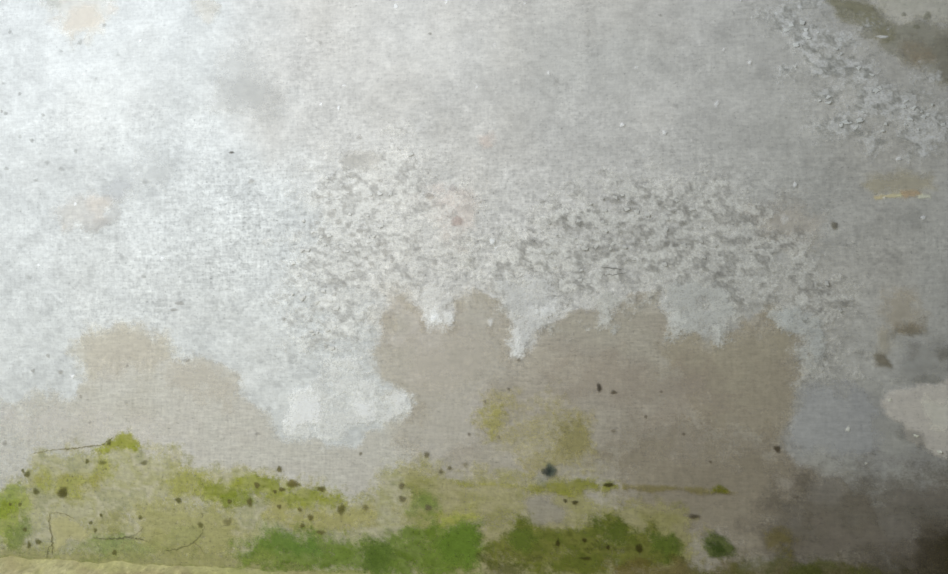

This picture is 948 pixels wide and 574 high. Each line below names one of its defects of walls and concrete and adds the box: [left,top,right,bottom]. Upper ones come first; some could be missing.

water stain [827,0,948,85]
crack [31,438,112,455]
water stain [0,272,948,574]
crack [47,512,205,555]